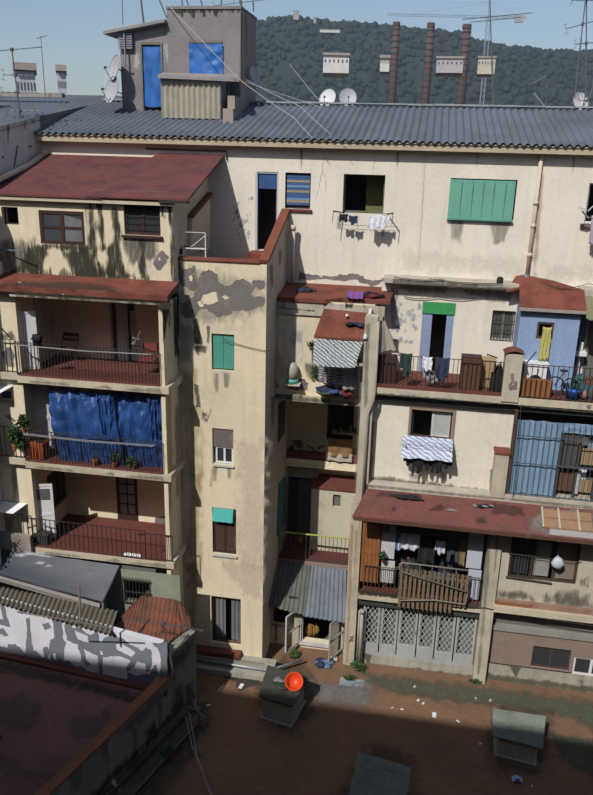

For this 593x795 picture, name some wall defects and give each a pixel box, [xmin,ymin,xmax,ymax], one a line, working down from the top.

peeling [153,250,169,270]
damp [0,199,181,366]
peeling [179,268,266,318]
peeling [298,271,382,286]
damp [194,319,210,354]
damp [545,592,588,607]
peeling [0,605,10,636]
peeling [152,642,168,678]
damp [92,684,194,795]